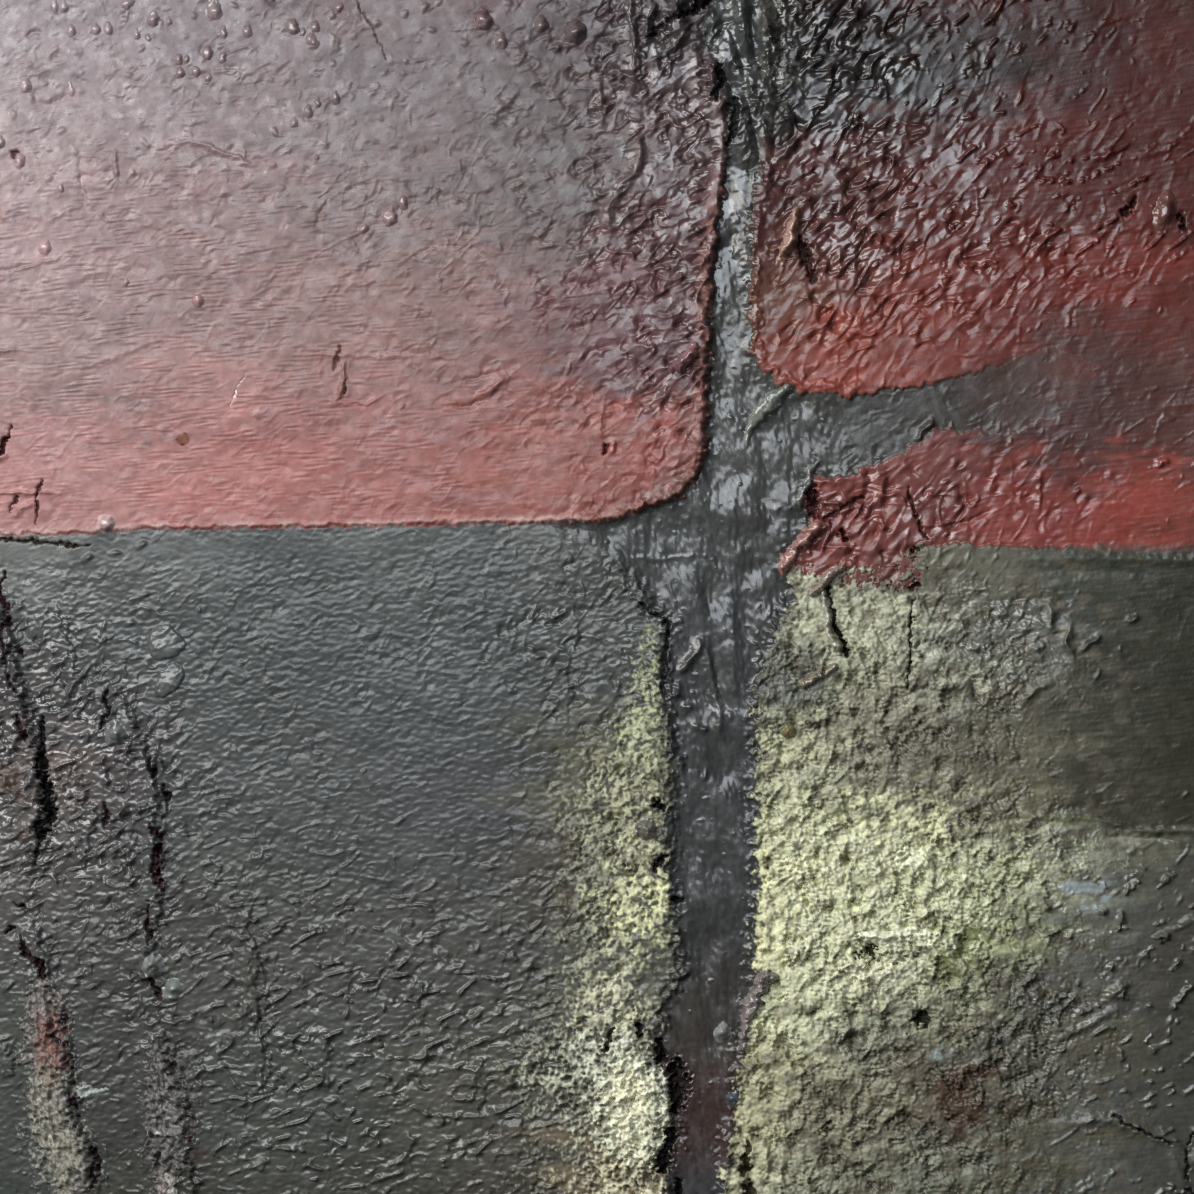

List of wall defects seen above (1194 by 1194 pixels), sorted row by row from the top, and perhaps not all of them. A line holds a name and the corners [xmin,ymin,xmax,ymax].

crack [0,479,91,548]
crack [637,602,672,680]
crack [0,571,59,866]
crack [99,690,112,730]
crack [102,801,112,829]
crack [145,757,172,946]
crack [148,977,163,1001]
crack [1111,1114,1194,1194]